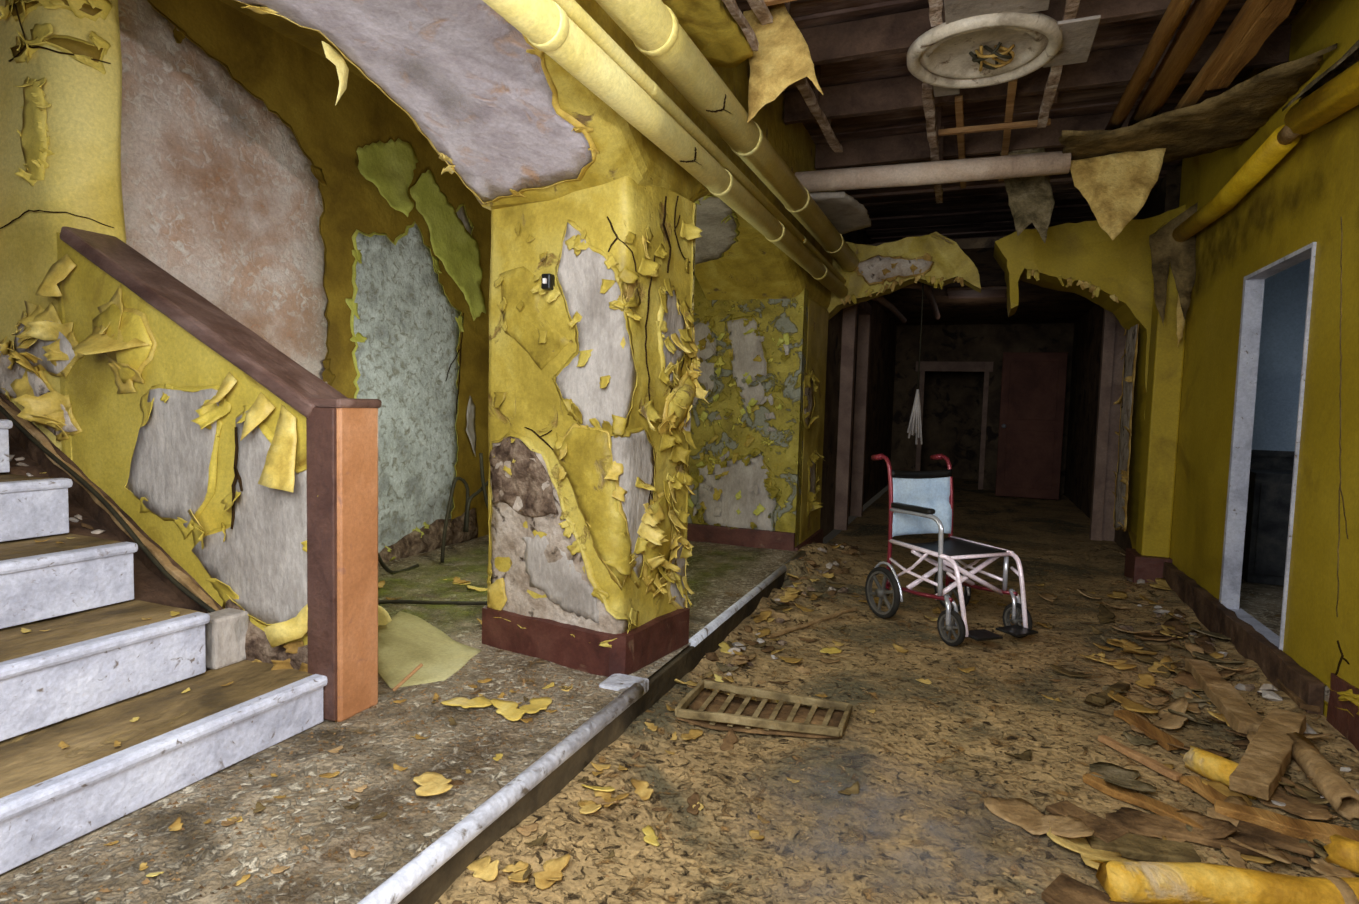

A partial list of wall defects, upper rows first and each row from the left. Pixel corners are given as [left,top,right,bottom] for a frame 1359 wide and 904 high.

crack [680,147,701,165]
flaking render [0,0,336,385]
crack [607,196,694,401]
flaking render [840,252,964,306]
spalling [1027,269,1040,281]
spalling [1057,275,1119,303]
flaking render [0,254,318,672]
peeling [807,448,825,516]